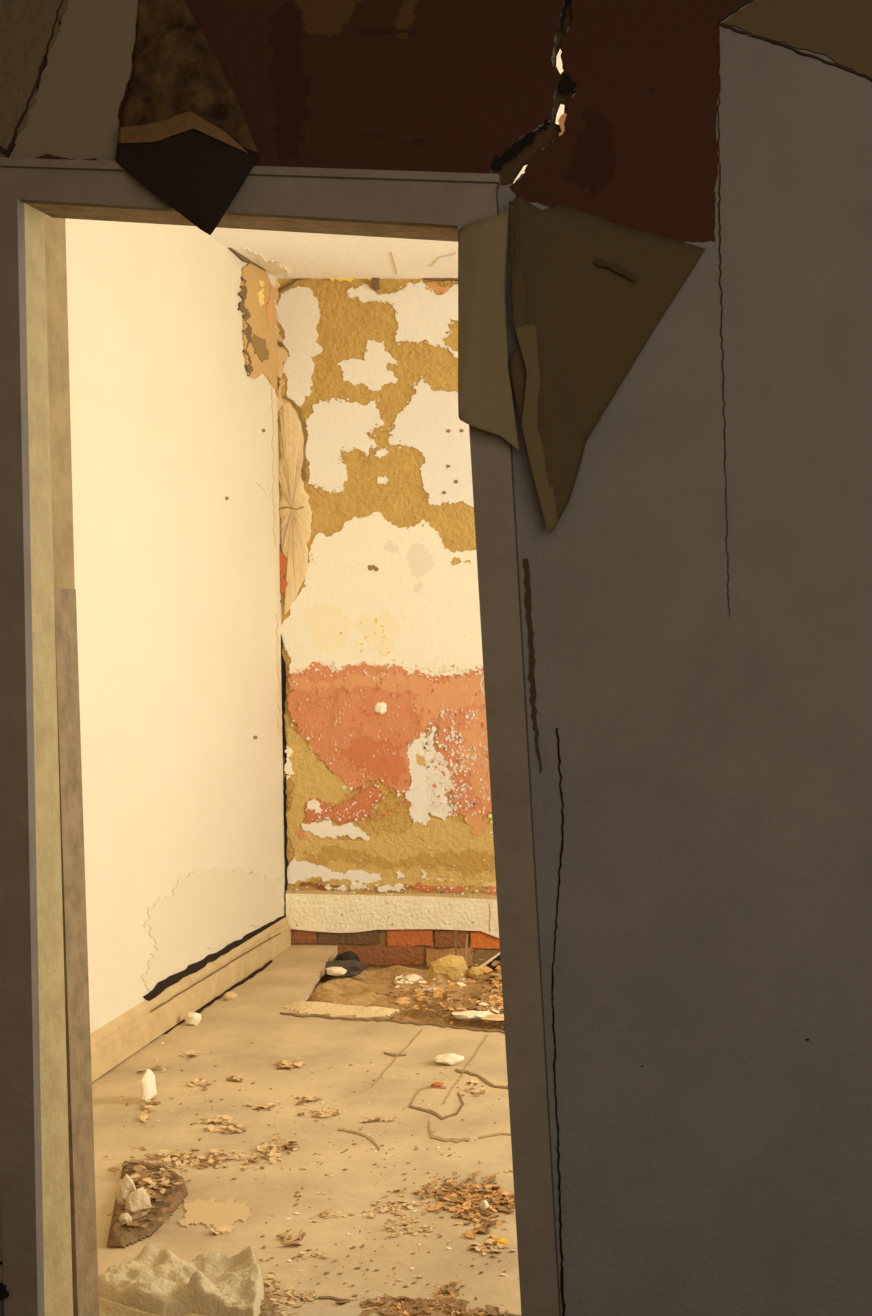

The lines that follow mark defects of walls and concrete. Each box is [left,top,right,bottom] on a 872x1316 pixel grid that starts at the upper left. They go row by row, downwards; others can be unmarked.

flaking render [117,81,130,126]
flaking render [184,0,744,243]
flaking render [442,324,458,351]
flaking render [283,725,496,916]